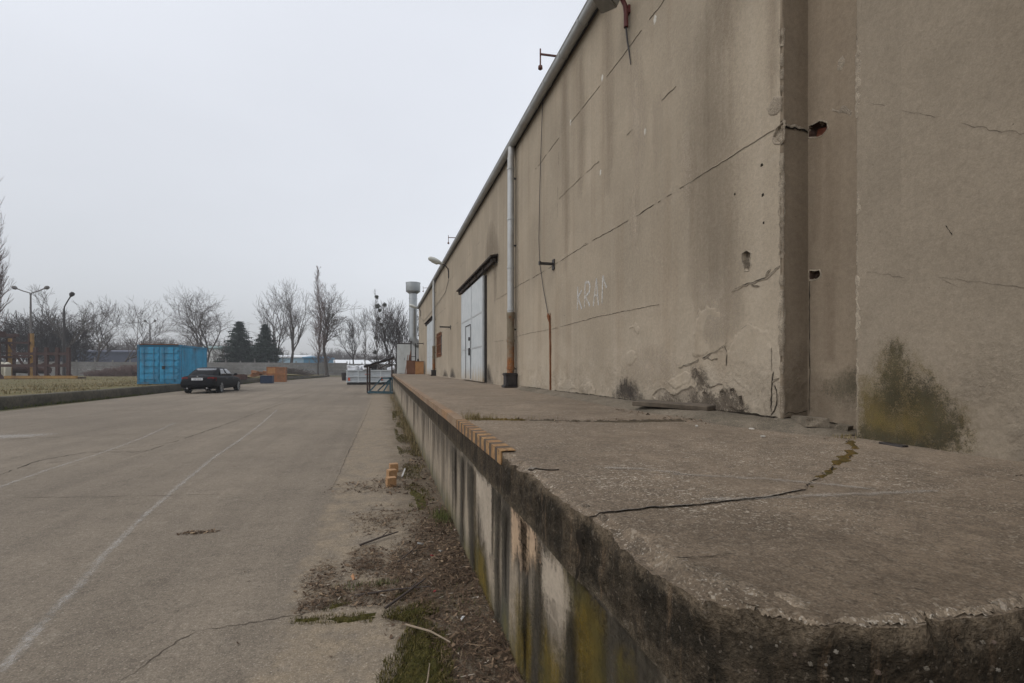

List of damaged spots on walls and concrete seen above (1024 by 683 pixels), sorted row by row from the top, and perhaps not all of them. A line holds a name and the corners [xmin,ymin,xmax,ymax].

crack [501,118,808,297]
spalling [741,250,752,272]
spalling [808,120,829,139]
water stain [658,367,750,413]
crack [575,281,1020,584]
water stain [442,442,664,683]